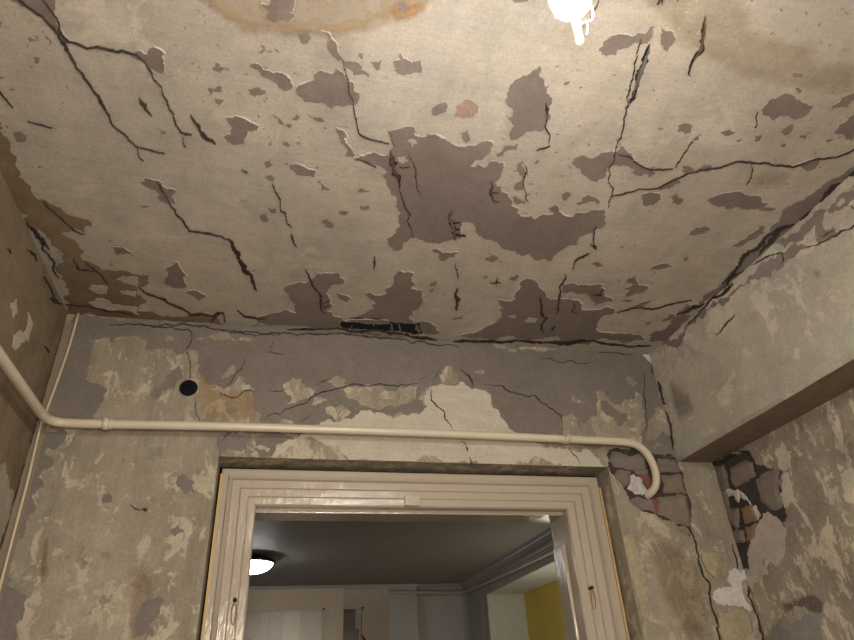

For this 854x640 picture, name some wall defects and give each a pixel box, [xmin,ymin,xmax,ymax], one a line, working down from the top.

crack [17,0,192,162]
peeling [248,30,382,109]
crack [341,58,422,237]
peeling [335,65,608,263]
crack [523,104,551,203]
peeling [598,24,678,57]
crack [608,40,854,325]
peeling [761,73,814,148]
crack [0,221,674,549]
peeling [0,122,854,544]
crack [689,526,721,640]
flaking render [713,441,803,570]